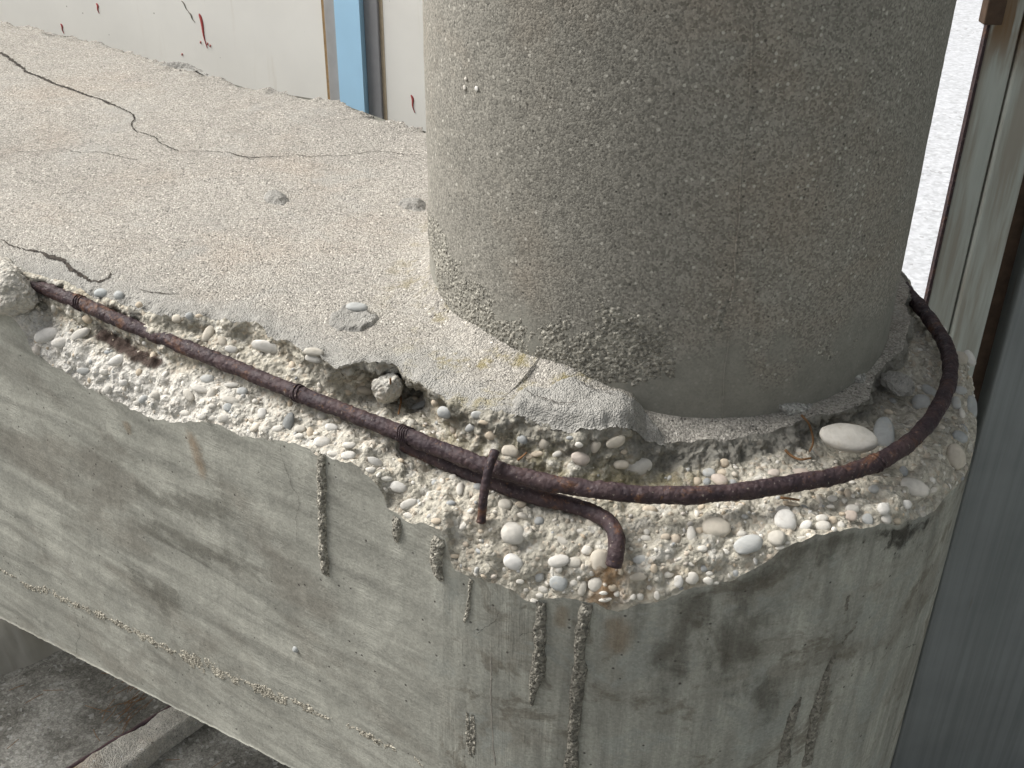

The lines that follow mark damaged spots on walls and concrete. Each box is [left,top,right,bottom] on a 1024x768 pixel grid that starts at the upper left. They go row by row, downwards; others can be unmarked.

crack [0,52,179,151]
crack [1,239,112,288]
spalling [11,271,977,612]